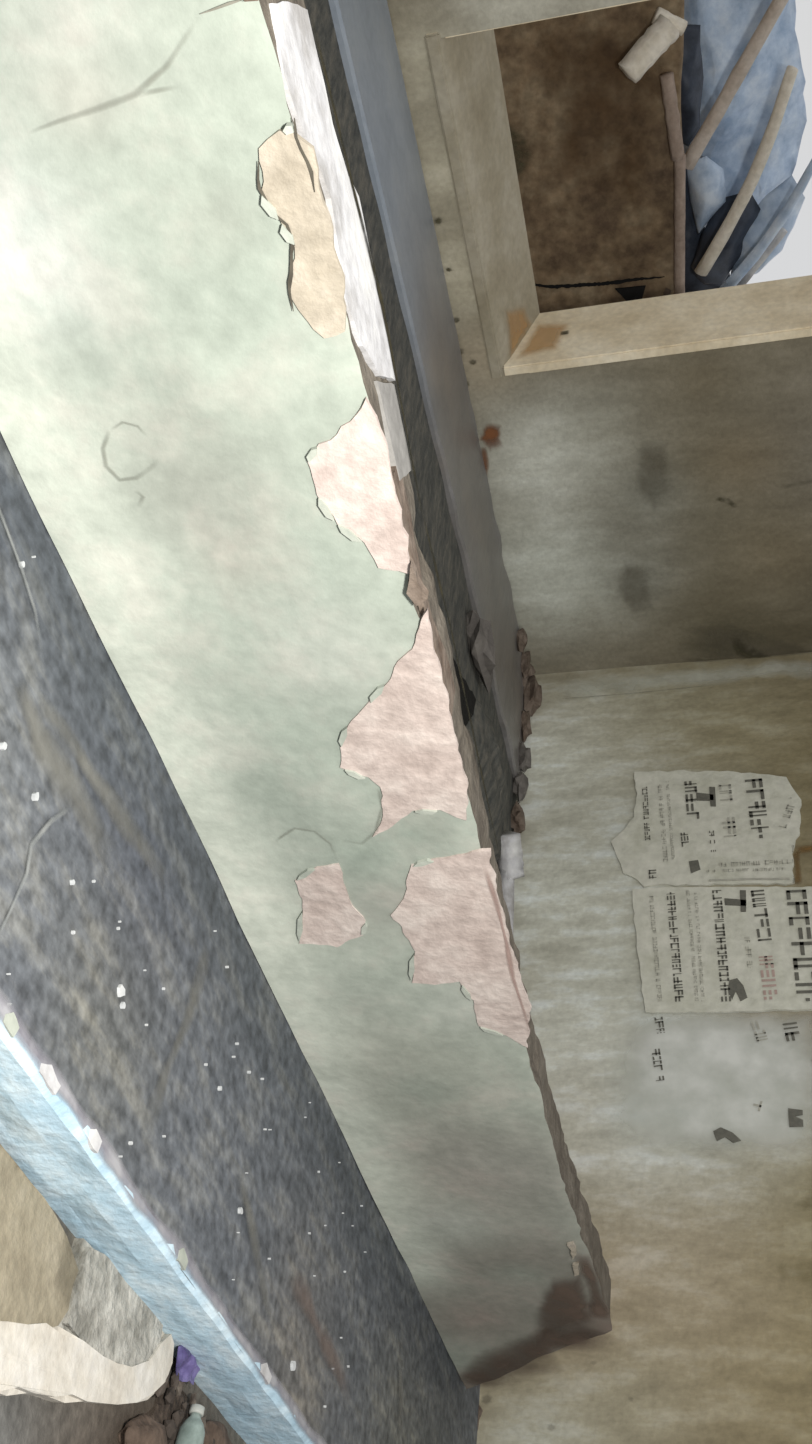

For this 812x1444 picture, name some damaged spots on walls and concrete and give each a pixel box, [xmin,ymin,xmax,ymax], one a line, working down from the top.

crack [201,0,242,14]
rust [512,314,568,351]
peeling [242,0,476,837]
peeling [295,863,368,947]
peeling [390,848,532,1048]
damp [467,1261,609,1386]